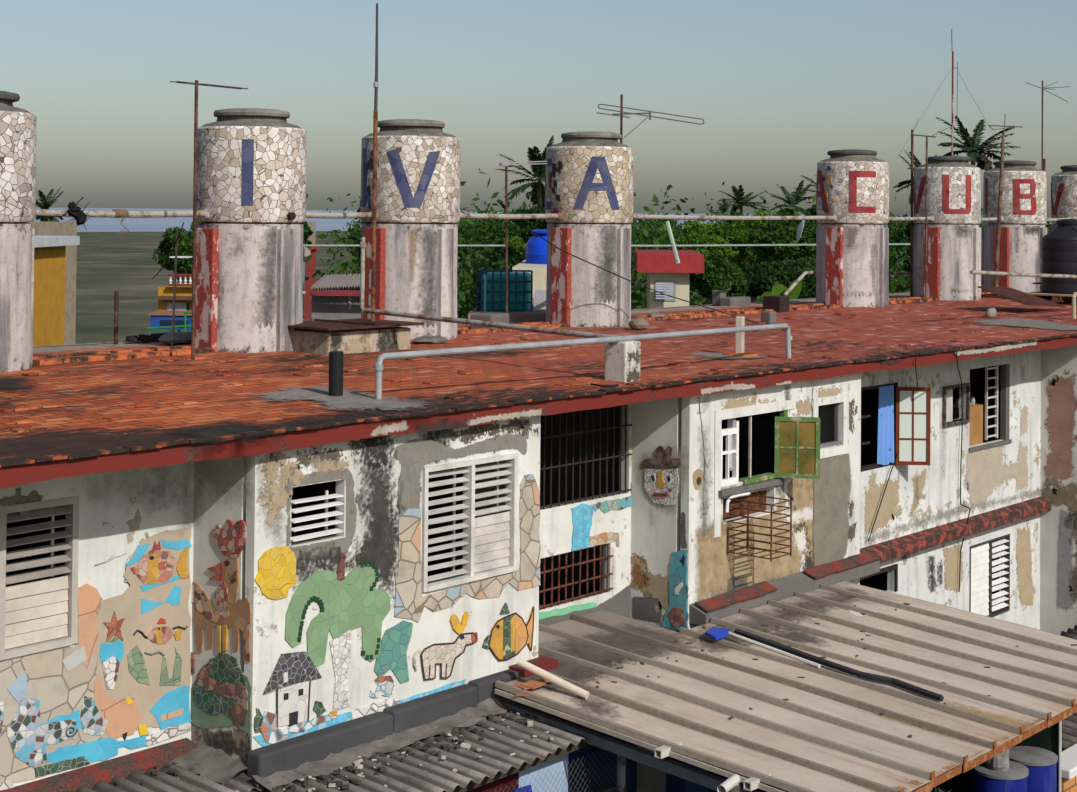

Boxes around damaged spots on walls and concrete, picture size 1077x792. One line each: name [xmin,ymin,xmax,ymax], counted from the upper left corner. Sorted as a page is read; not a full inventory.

peeling [551,230,566,323]
water stain [197,461,260,493]
peeling [256,439,367,526]
water stain [169,412,470,445]
water stain [293,435,422,599]
peeling [442,414,539,454]
spalling [630,553,686,627]
peeling [696,478,814,601]
peeling [848,465,930,542]
peeling [961,406,1029,512]
peeling [1015,519,1036,606]
peeling [1041,370,1077,611]